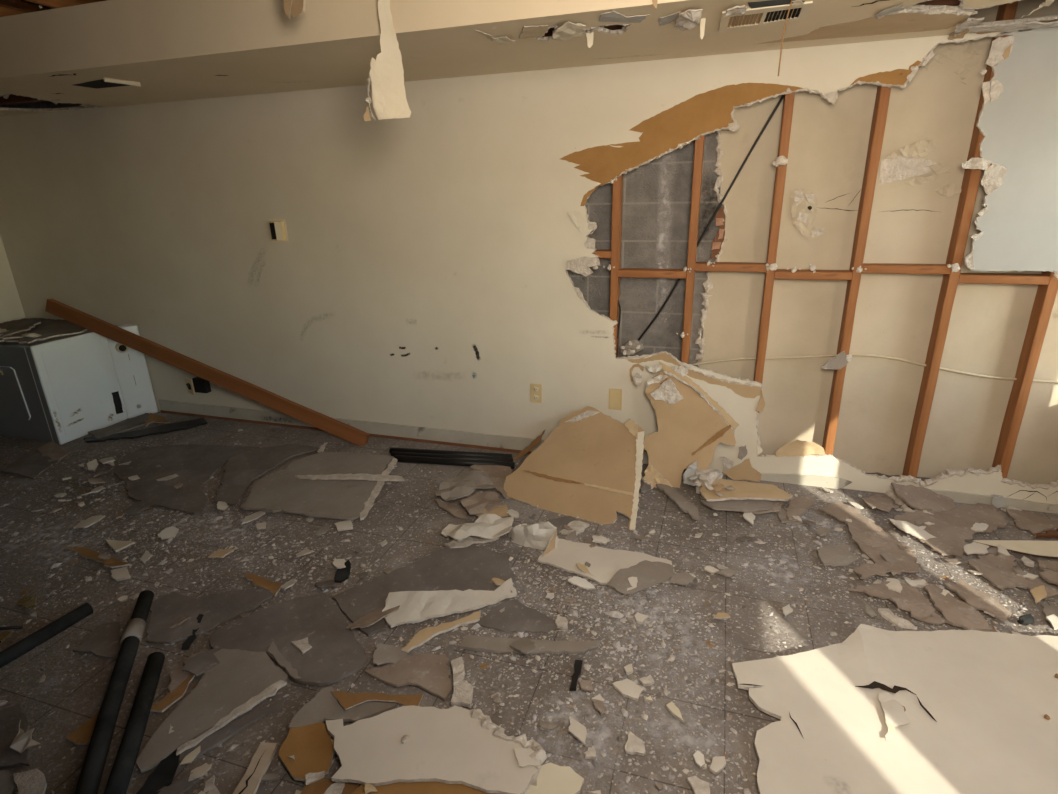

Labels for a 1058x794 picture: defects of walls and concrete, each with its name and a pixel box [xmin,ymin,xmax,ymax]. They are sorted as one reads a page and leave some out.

peeling [475,21,586,44]
peeling [599,0,703,31]
peeling [725,5,748,18]
flaking render [786,0,1058,270]
spalling [565,179,655,359]
flaking render [676,105,776,457]
spalling [803,454,1058,508]